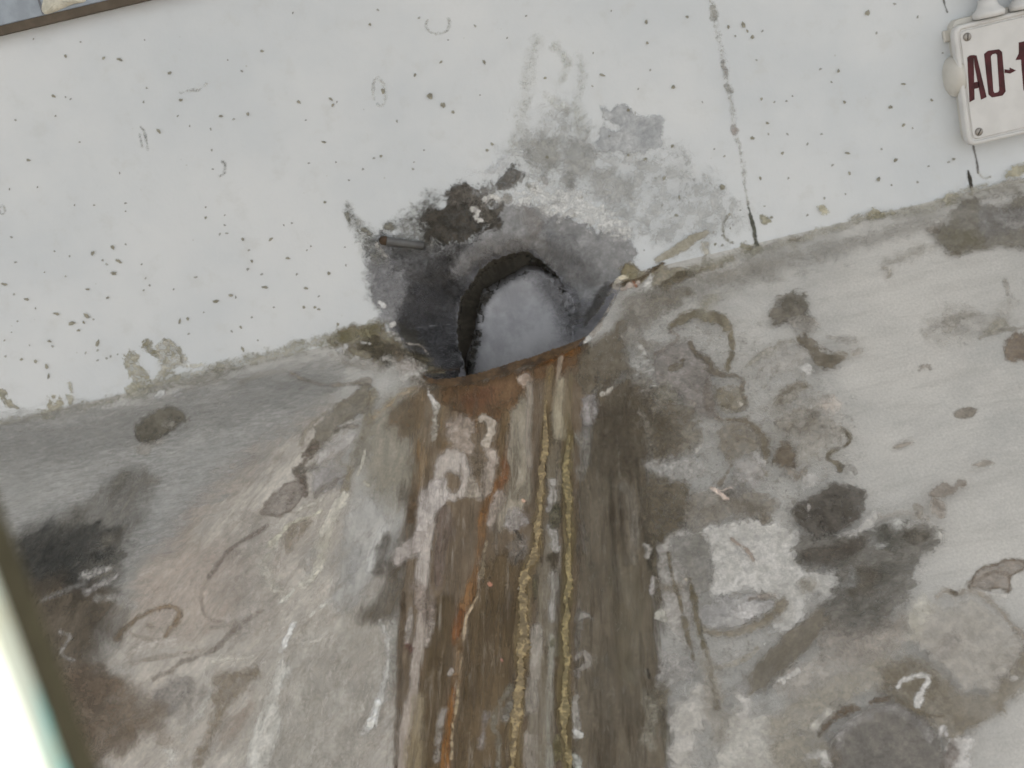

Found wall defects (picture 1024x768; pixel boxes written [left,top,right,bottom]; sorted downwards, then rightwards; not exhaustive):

damp [0,107,738,768]
corrosion [362,337,589,768]
spalling [421,247,622,379]
crack [710,7,771,255]
damp [479,194,1024,768]